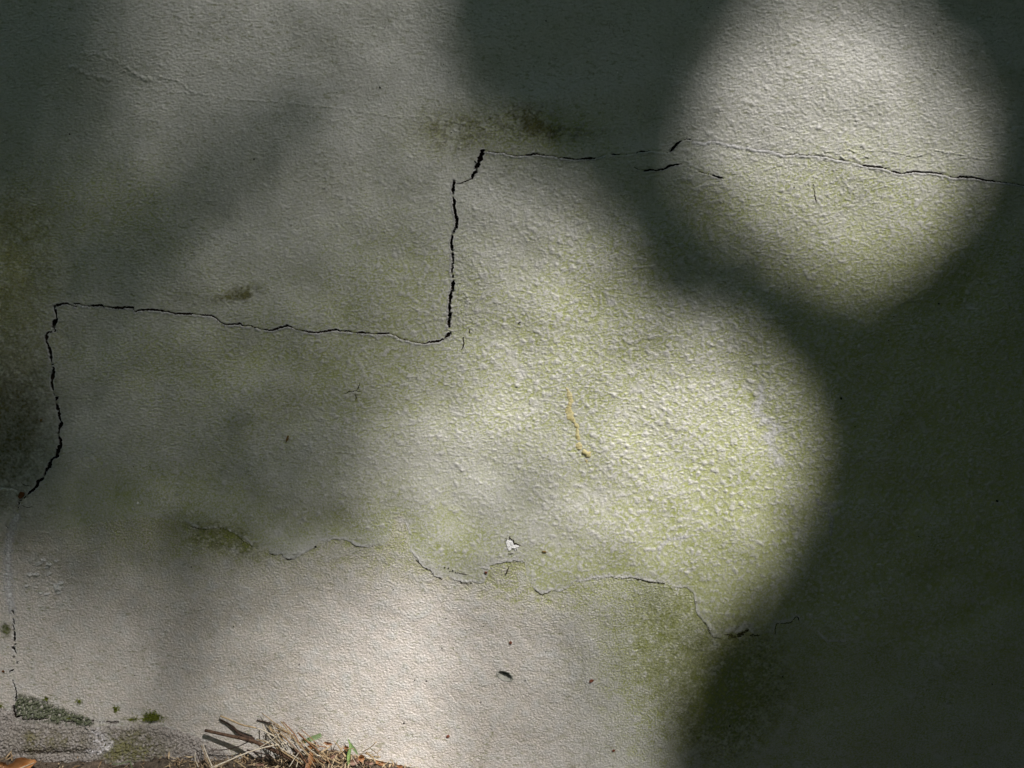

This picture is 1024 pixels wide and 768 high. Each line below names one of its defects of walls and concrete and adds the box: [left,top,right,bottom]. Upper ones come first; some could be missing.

crack [5,138,1024,529]
peeling [410,536,525,585]